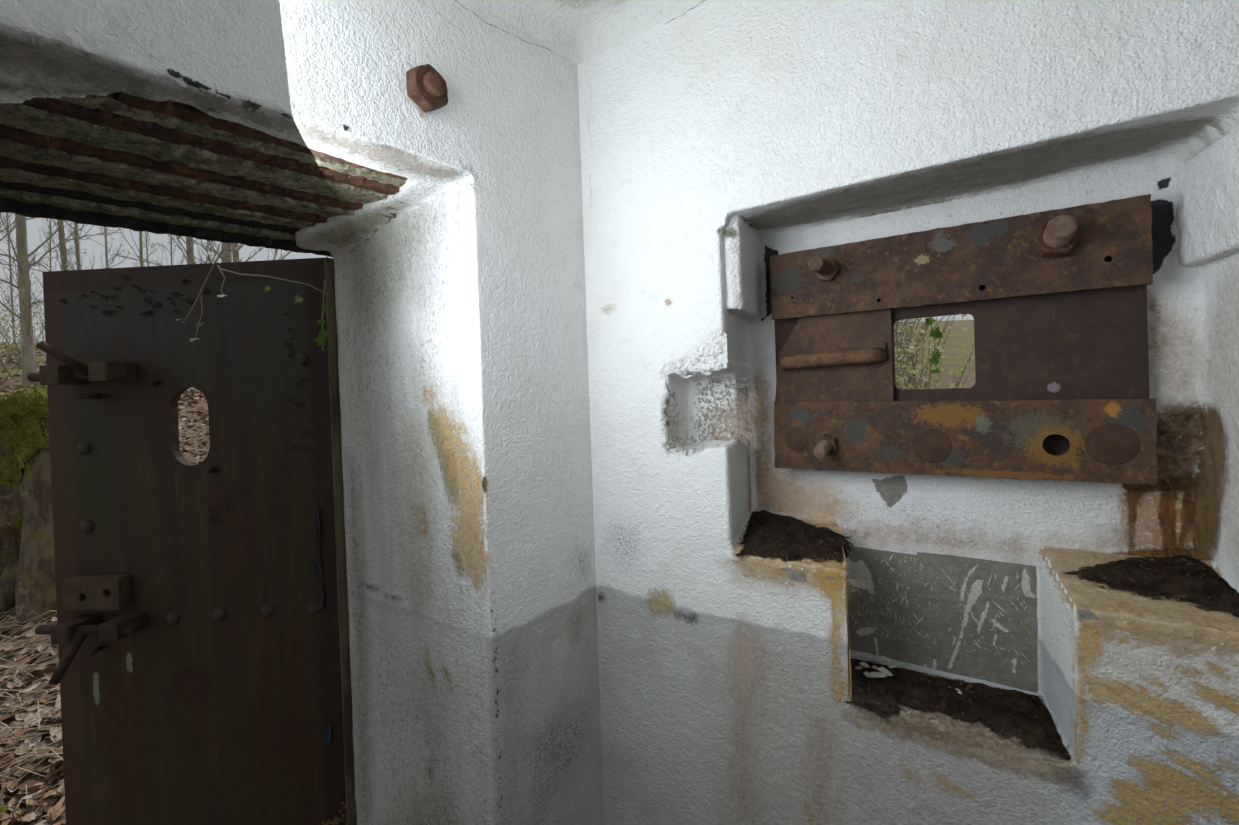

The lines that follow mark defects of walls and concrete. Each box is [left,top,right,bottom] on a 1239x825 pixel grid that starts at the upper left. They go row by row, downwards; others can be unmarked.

flaking render [659,327,753,436]
corrosion [732,381,1239,774]